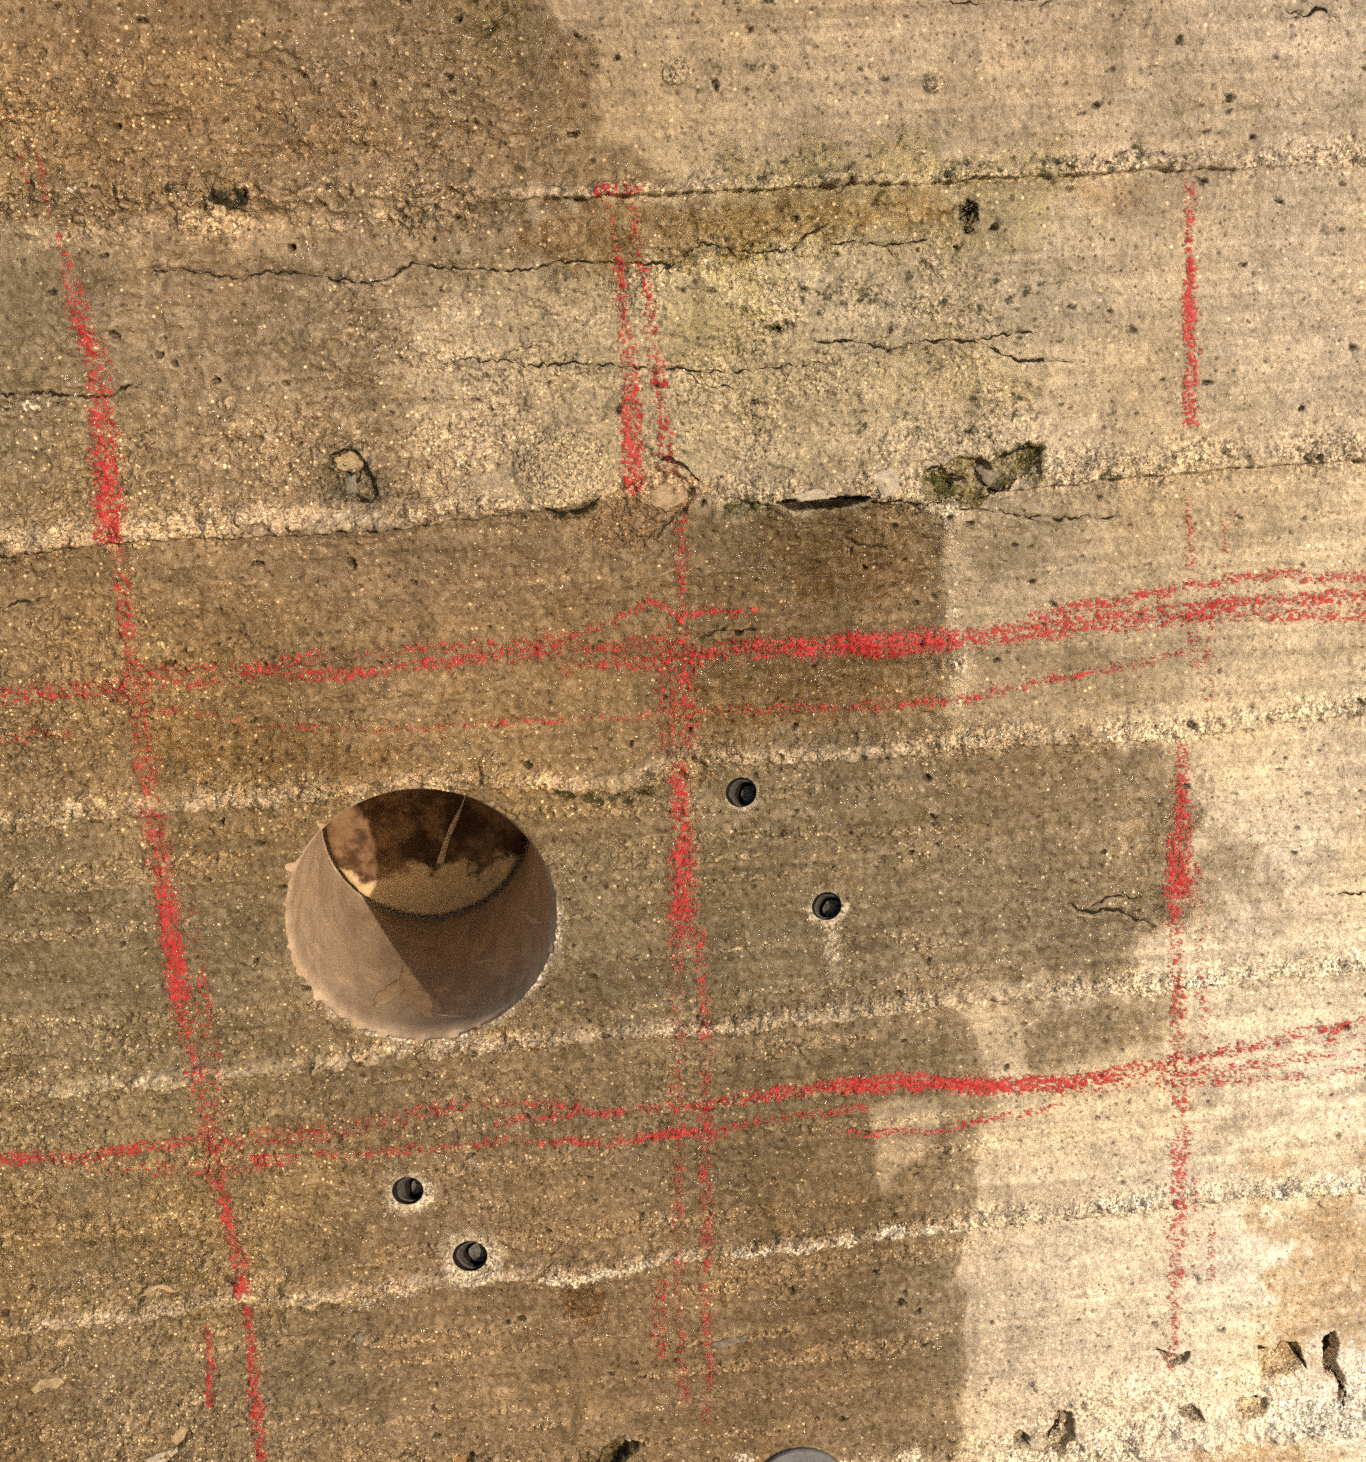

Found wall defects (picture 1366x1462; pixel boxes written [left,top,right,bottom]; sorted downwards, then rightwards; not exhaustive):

crack [149,224,929,284]
leakage [2,397,51,411]
spalling [776,467,899,511]
spalling [921,440,1047,510]
leakage [924,497,963,551]
crack [843,495,1119,553]
leakage [945,571,973,740]
leakage [725,1174,1307,1259]
leakage [527,1261,653,1289]
spalling [1237,1331,1347,1419]
leakage [897,1447,921,1462]
spalling [1013,1410,1077,1457]